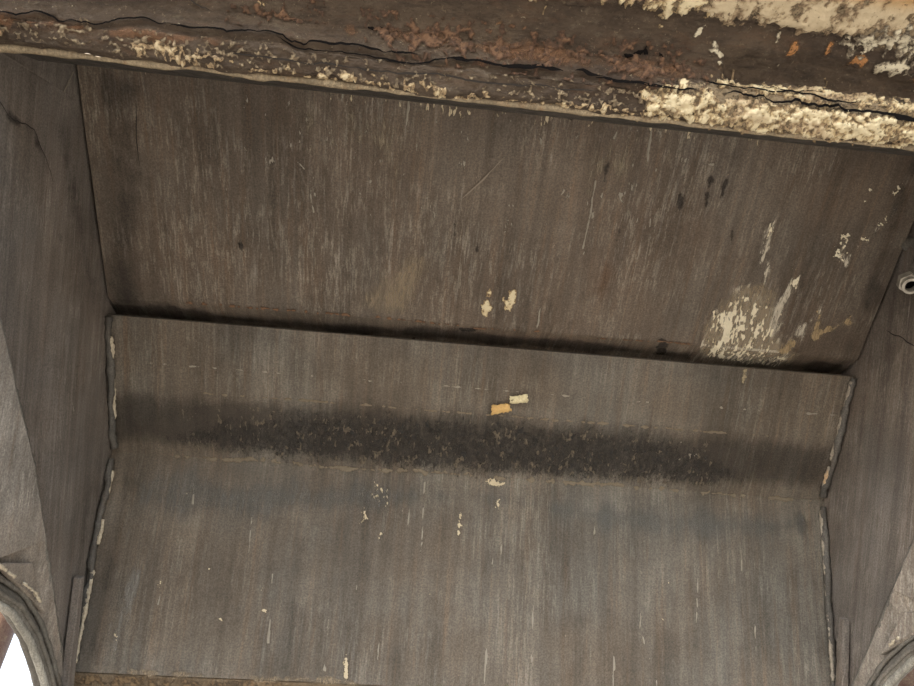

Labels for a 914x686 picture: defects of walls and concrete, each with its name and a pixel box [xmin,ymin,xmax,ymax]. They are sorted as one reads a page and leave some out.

peeling [248,63,490,100]
crack [0,0,914,122]
corrosion [351,7,710,95]
peeling [502,70,914,149]
peeling [618,0,914,77]
peeling [707,286,786,365]